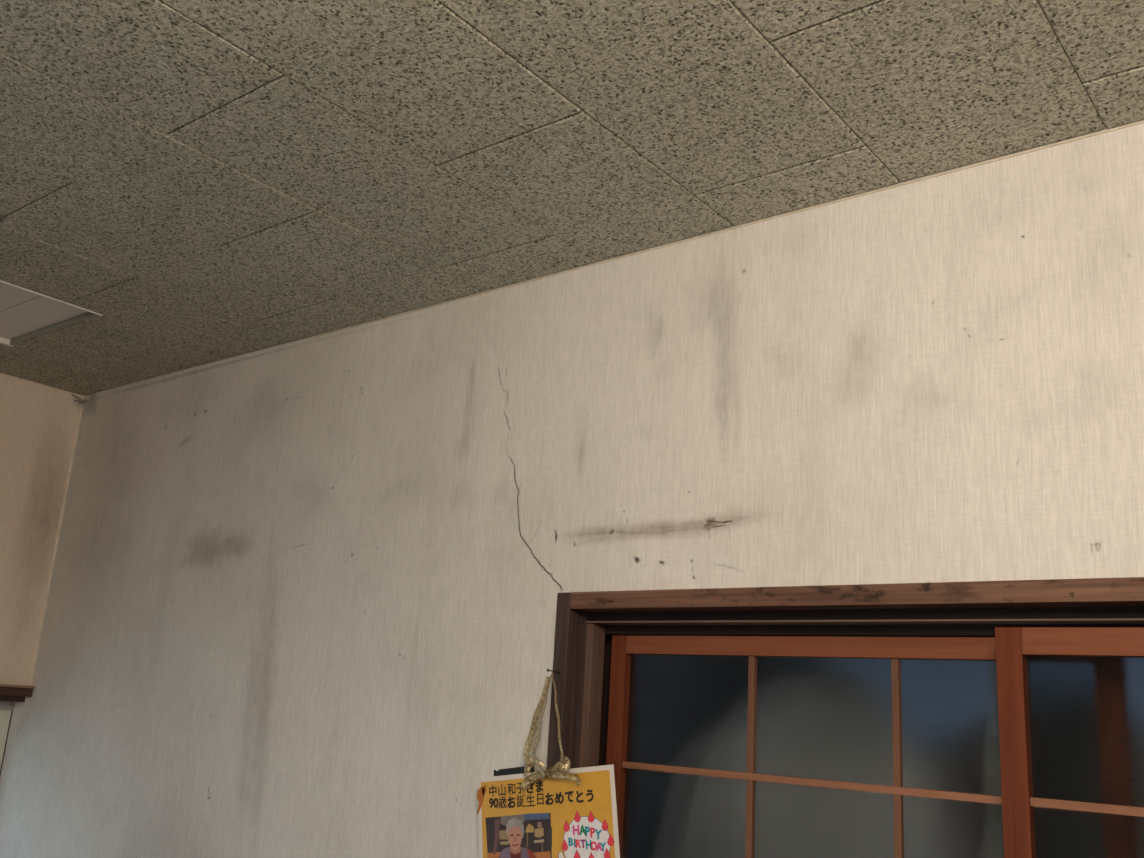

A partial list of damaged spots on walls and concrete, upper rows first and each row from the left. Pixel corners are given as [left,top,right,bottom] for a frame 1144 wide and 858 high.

crack [504,413,562,590]